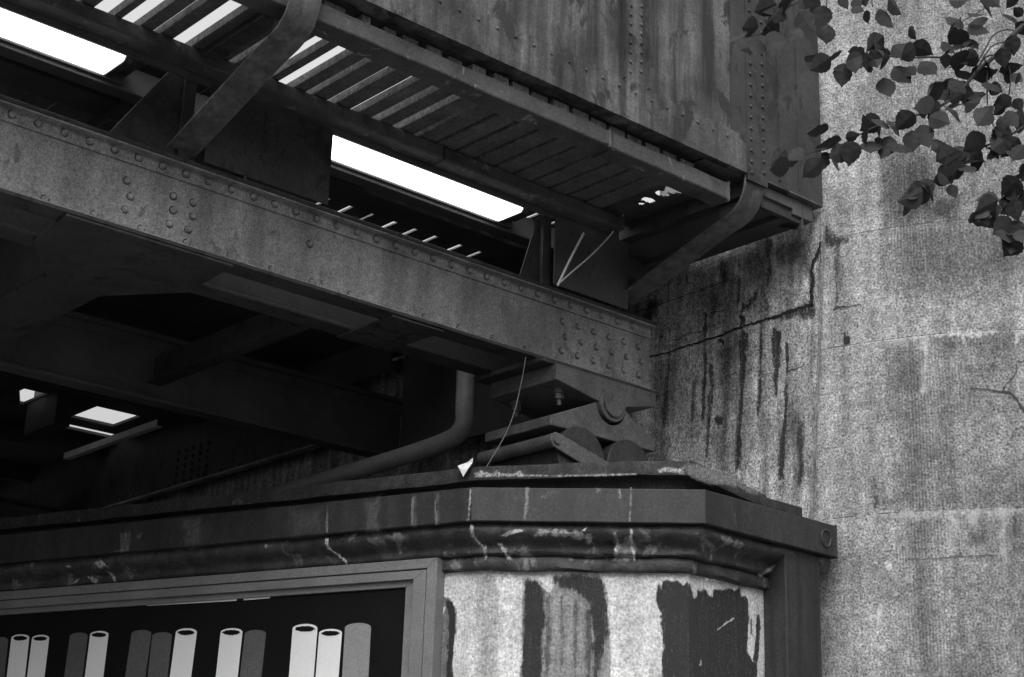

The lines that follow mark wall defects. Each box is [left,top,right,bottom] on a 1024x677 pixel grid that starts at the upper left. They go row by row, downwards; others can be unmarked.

crack [637,226,860,357]
damp [691,312,713,458]
damp [718,238,805,485]
crack [969,361,1024,437]
peeling [520,574,610,677]
peeling [656,579,761,677]